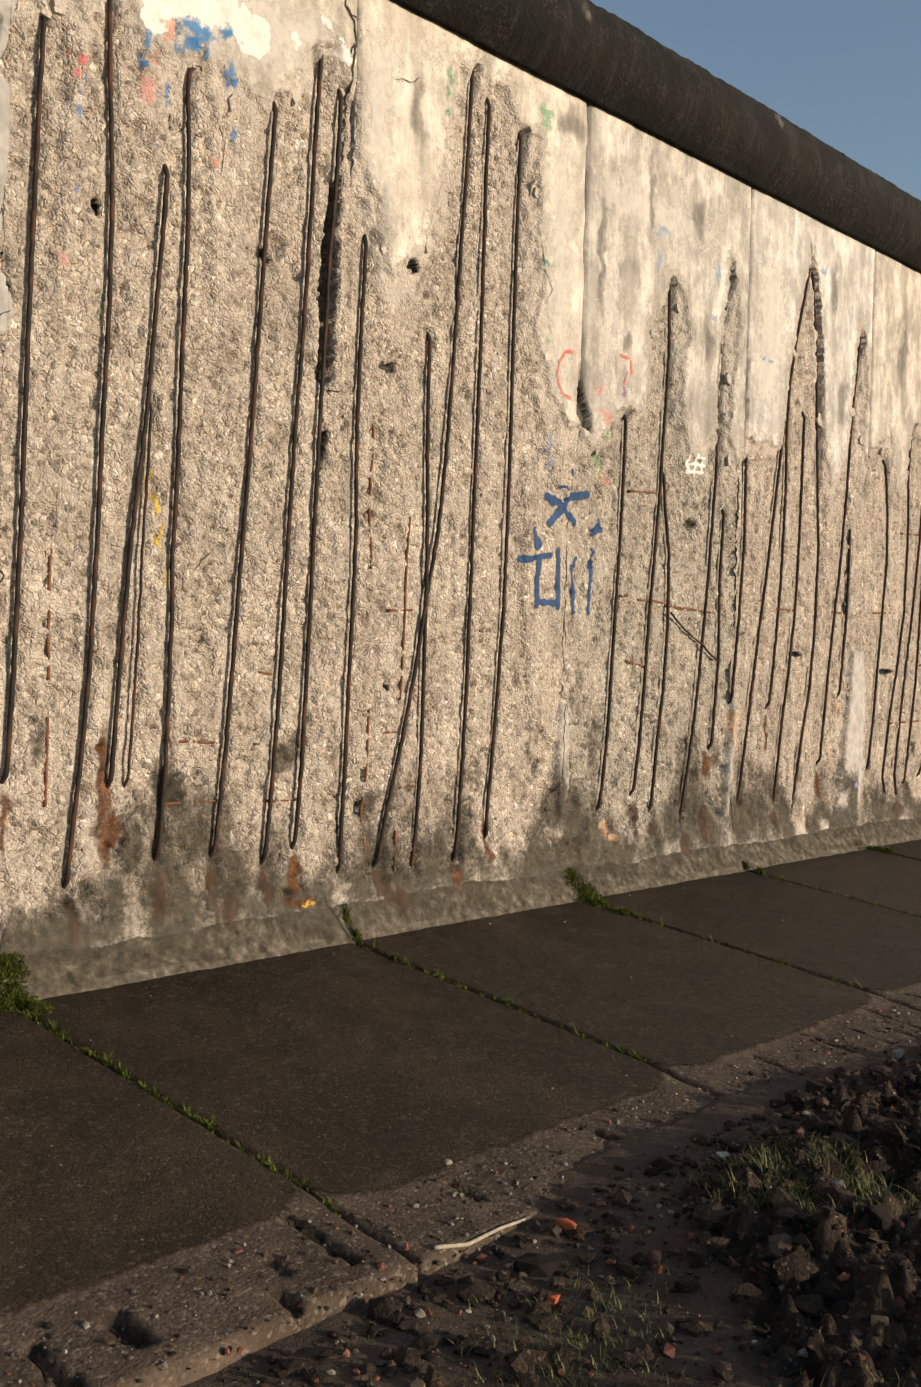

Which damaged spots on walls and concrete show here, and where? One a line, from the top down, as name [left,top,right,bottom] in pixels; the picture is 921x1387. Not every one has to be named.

spalling [0,0,921,954]
rust [94,737,124,864]
rust [259,856,310,908]